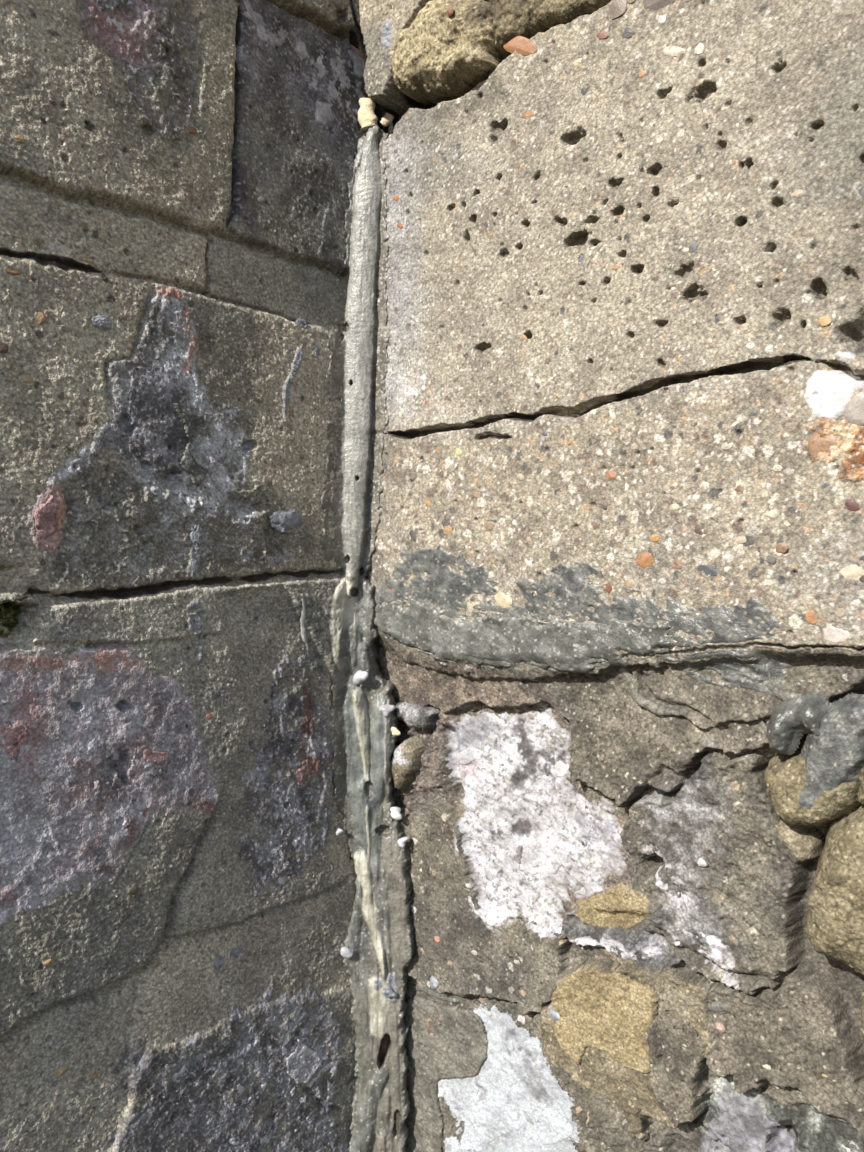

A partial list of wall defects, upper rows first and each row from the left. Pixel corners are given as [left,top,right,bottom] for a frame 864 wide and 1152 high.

crack [349,29,360,51]
crack [0,247,103,274]
crack [386,353,864,440]
spalling [21,283,263,559]
crack [17,570,334,601]